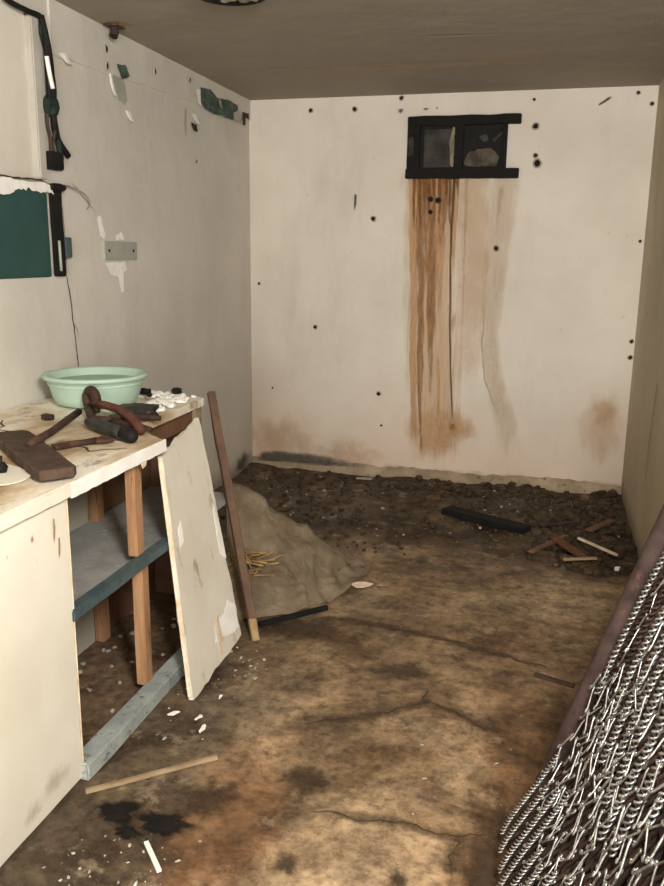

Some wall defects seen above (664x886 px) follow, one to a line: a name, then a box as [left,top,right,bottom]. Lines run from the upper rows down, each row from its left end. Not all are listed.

peeling [104,44,134,122]
peeling [188,76,249,132]
peeling [0,177,54,195]
peeling [105,261,127,293]
corrosion [409,179,466,451]
crack [290,617,553,671]
crack [304,688,513,734]
crack [312,810,490,878]